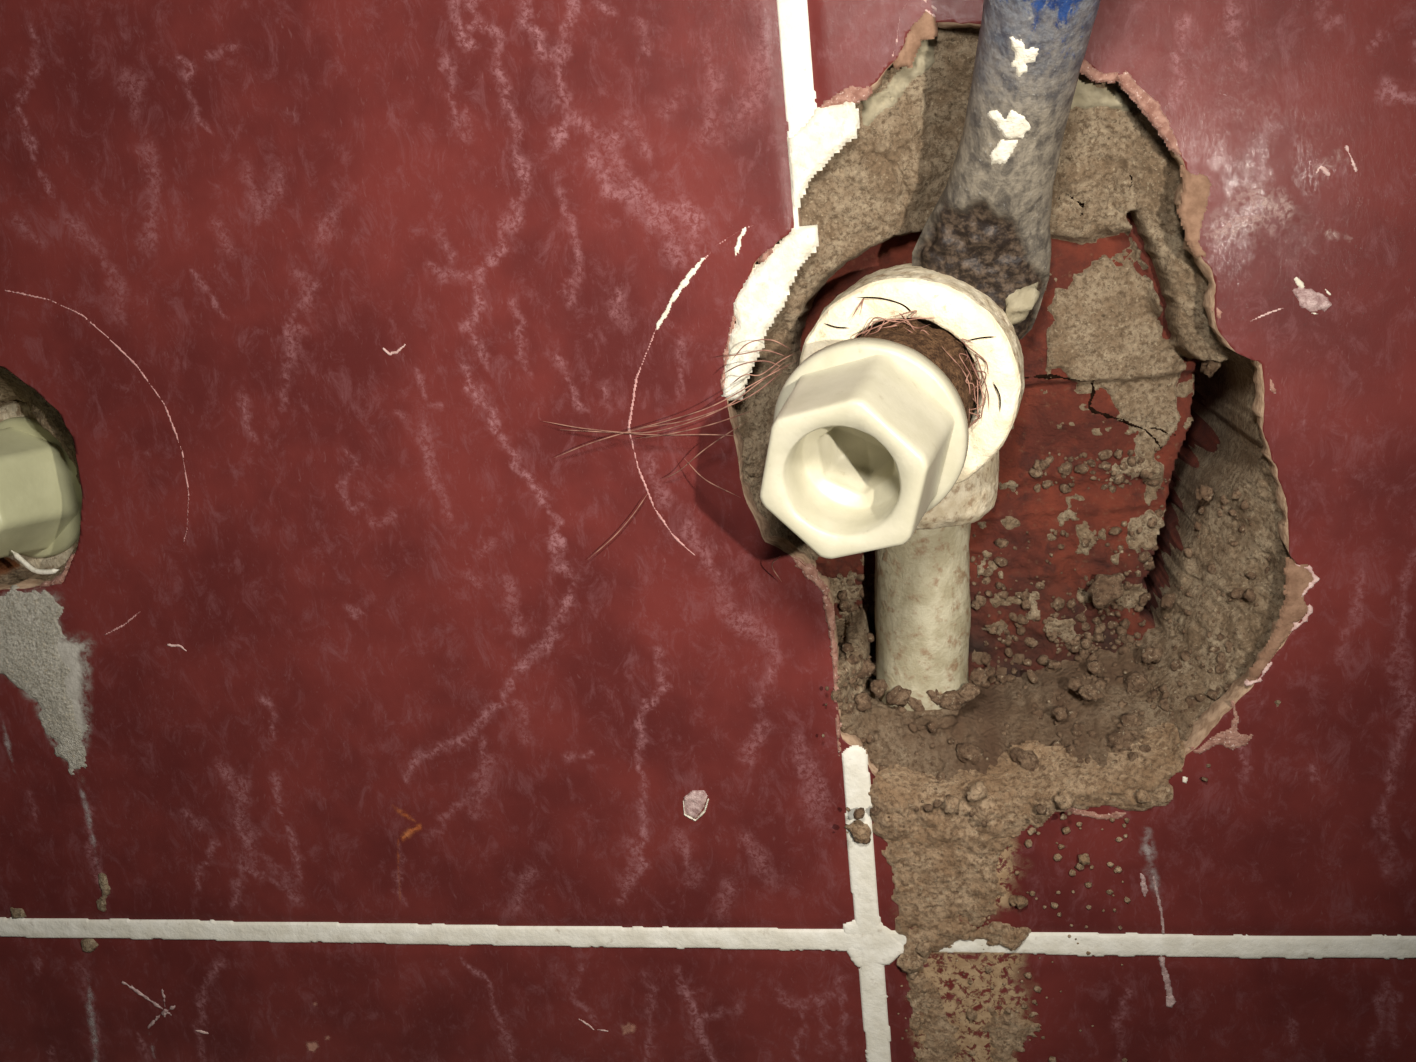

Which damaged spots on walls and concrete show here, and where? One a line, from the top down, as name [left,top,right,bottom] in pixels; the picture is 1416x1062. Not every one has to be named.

spalling [0,366,81,485]
spalling [732,0,1320,828]
crack [993,374,1176,449]
spalling [0,547,77,588]
spalling [844,806,905,833]